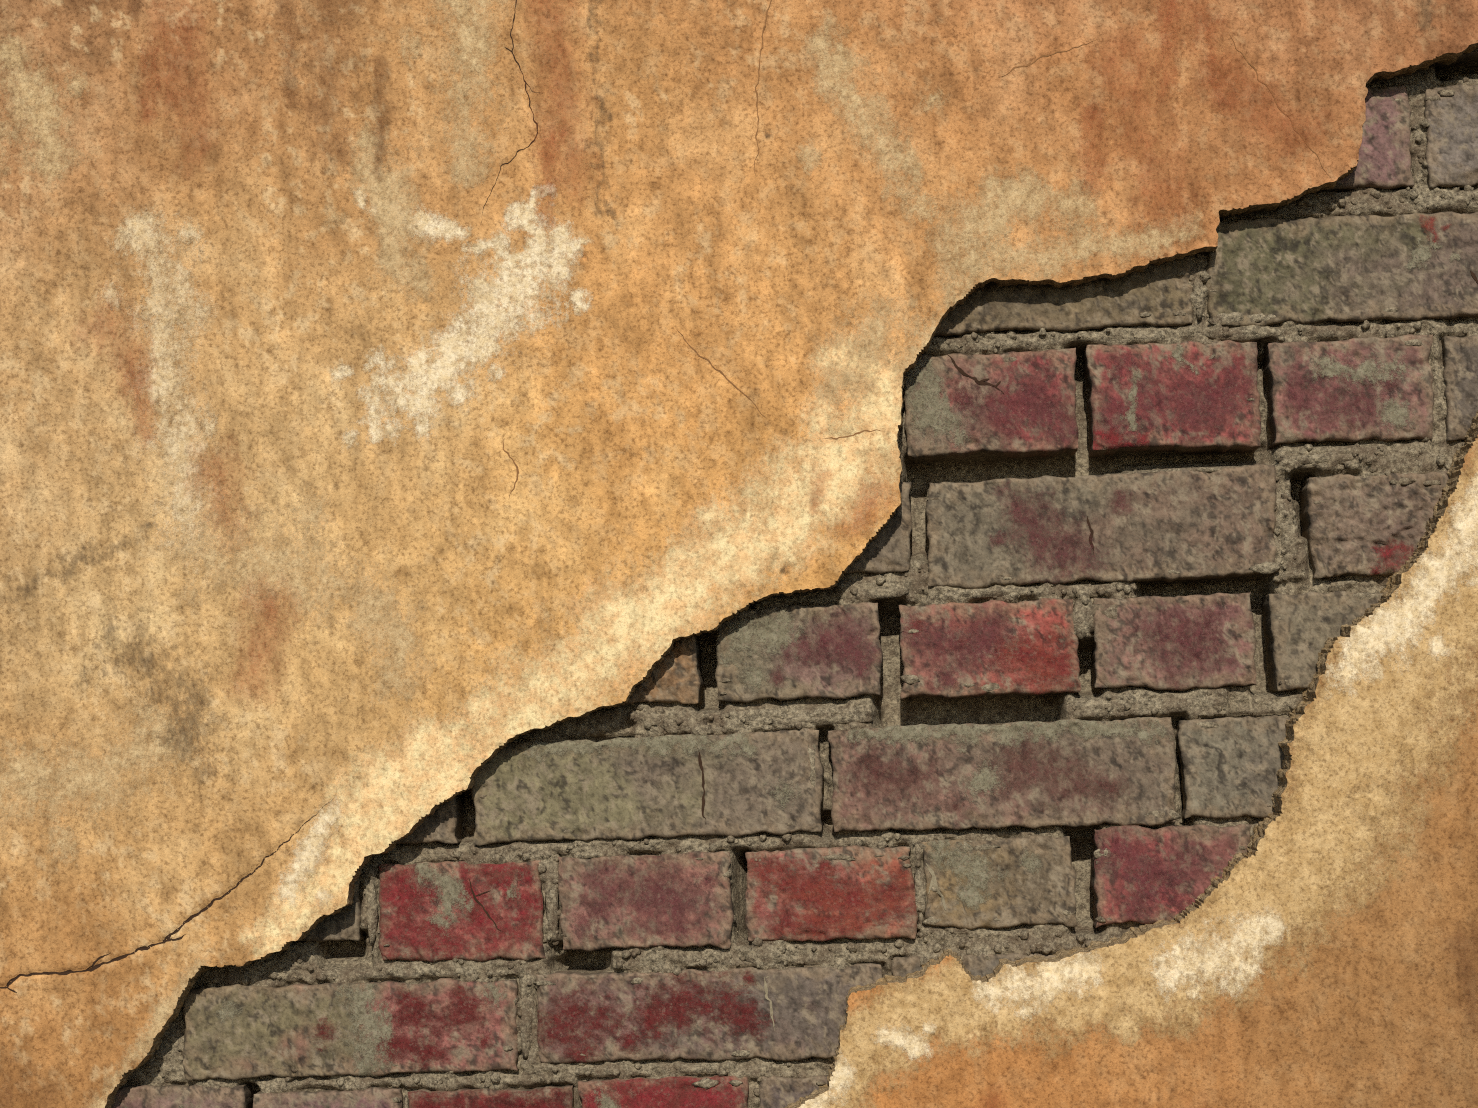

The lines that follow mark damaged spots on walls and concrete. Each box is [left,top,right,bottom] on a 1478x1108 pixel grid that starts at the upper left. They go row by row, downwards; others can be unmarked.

peeling [0,37,88,181]
crack [482,0,541,213]
crack [754,0,772,172]
flaking render [1216,160,1358,230]
flaking render [1365,43,1478,98]
peeling [94,0,1218,1108]
peeling [0,692,192,859]
peeling [785,410,1478,1108]
crack [0,799,333,993]